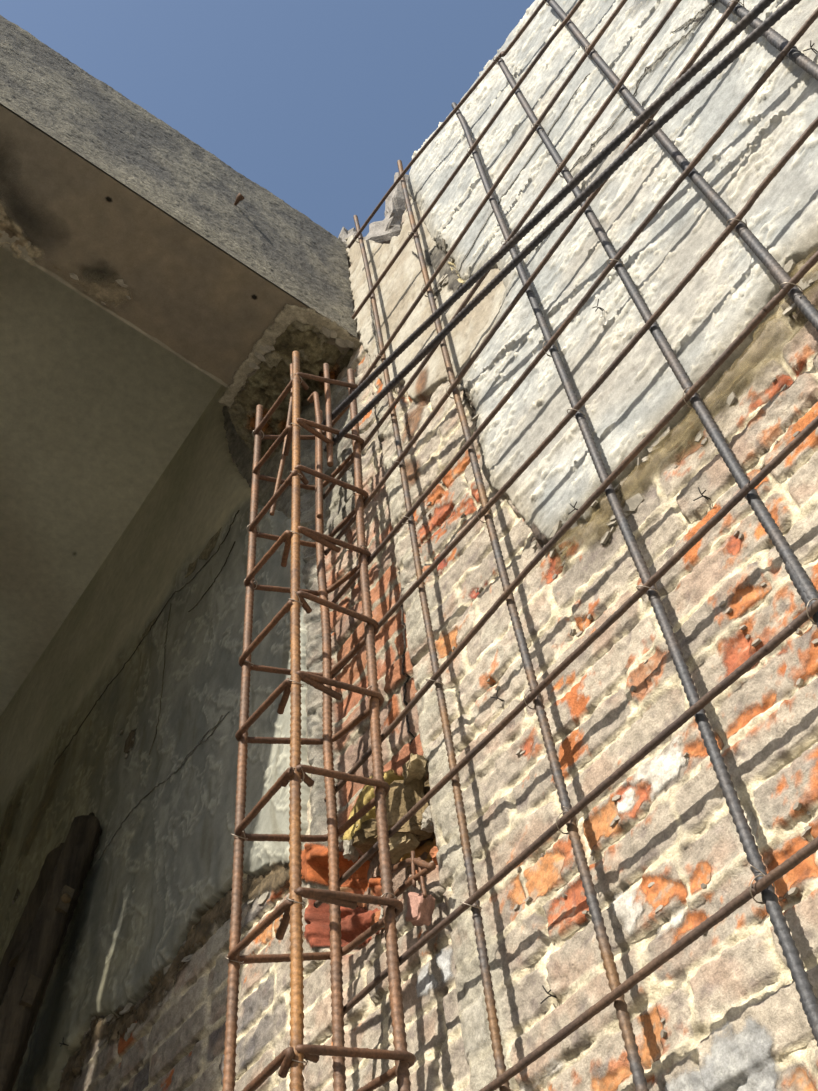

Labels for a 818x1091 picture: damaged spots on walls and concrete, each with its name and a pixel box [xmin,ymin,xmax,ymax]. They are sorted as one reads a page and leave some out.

crack [570,0,718,172]
peeling [0,204,131,308]
spalling [218,304,361,462]
spalling [301,0,818,1091]
crack [53,510,240,765]
crack [398,571,415,745]
crack [99,712,229,860]
flaking render [58,862,290,1091]